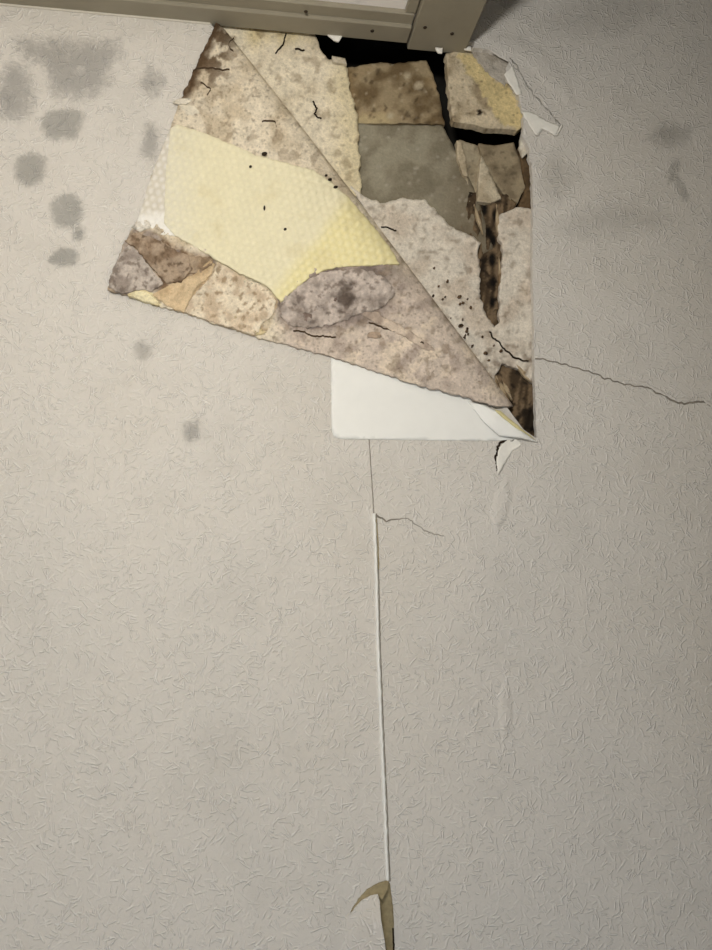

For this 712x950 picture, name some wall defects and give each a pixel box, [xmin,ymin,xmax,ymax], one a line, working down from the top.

peeling [107,23,534,436]
crack [535,358,712,407]
crack [376,515,444,536]